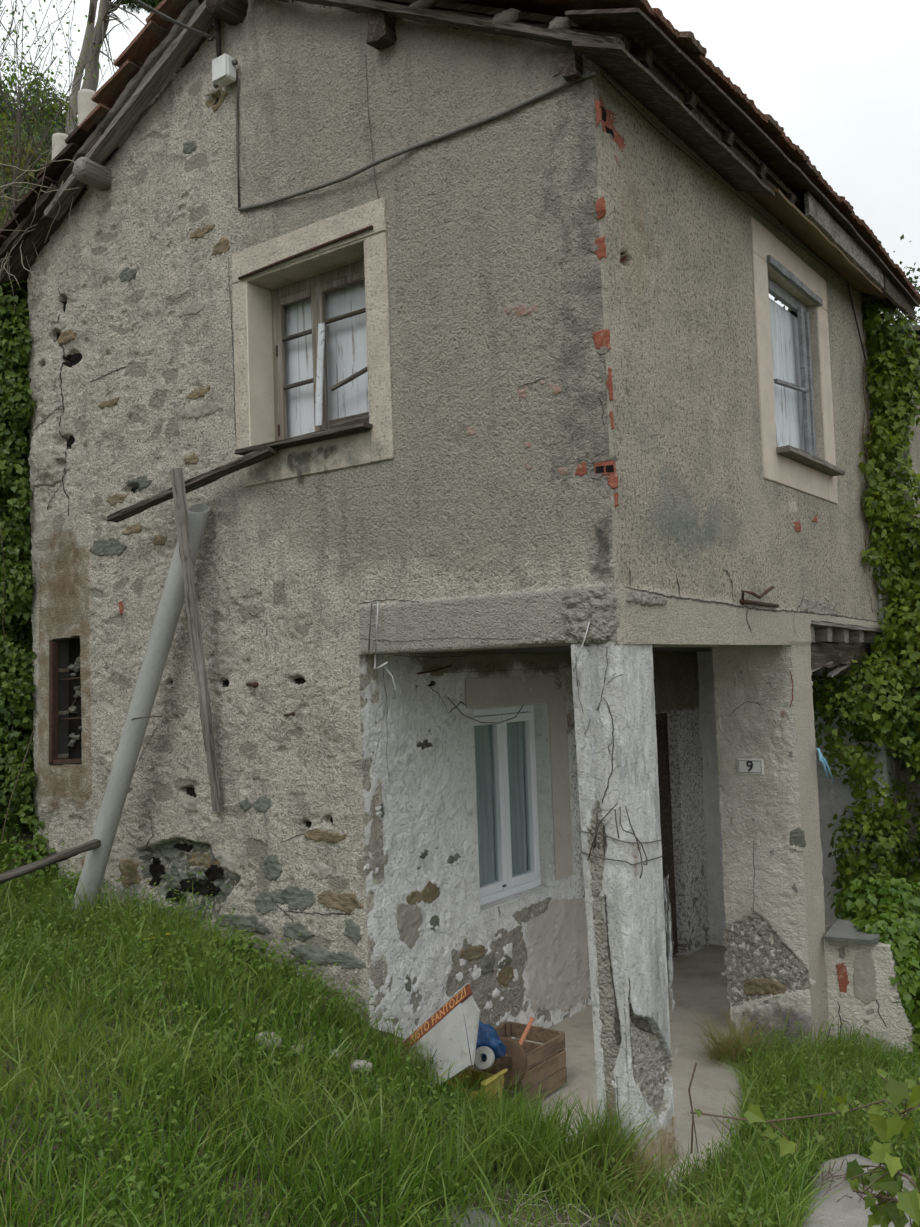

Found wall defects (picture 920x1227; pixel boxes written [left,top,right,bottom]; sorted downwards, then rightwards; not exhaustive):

flaking render [595,90,625,168]
flaking render [594,196,607,220]
flaking render [588,235,628,263]
flaking render [592,329,615,430]
spalling [518,586,667,647]
corrosion [739,586,779,608]
peeling [442,897,553,1028]
spalling [543,802,672,1132]
peeling [721,912,816,1006]
flaking render [836,961,849,998]